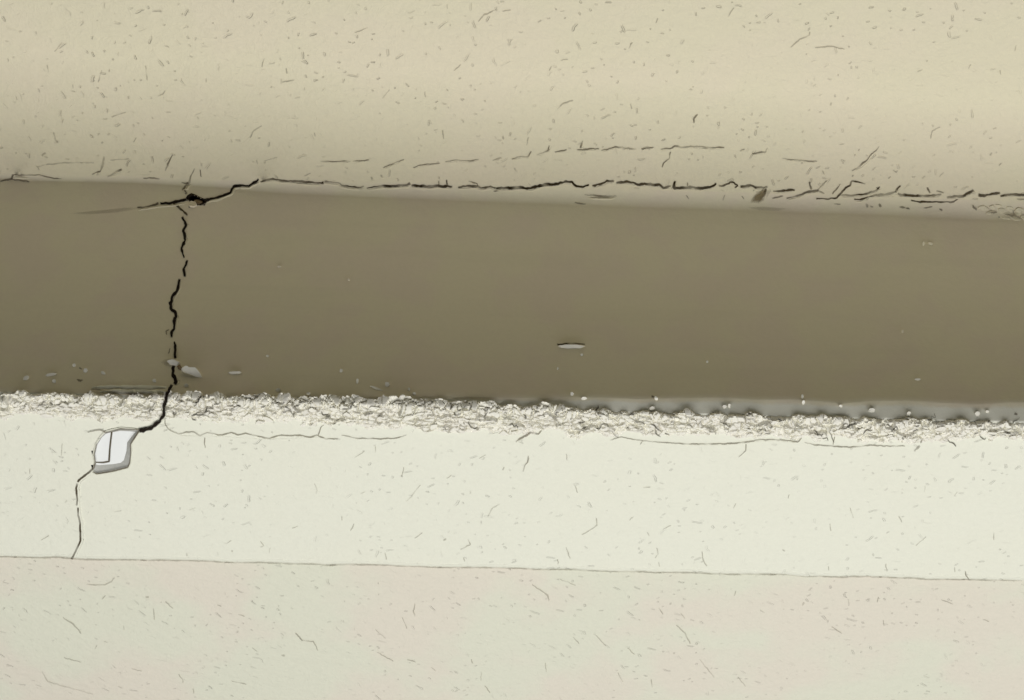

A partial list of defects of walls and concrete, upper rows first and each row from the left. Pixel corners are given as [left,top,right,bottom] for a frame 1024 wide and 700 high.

crack [137,145,1024,445]
spalling [0,390,1024,475]
crack [662,438,891,448]
crack [0,467,1022,579]